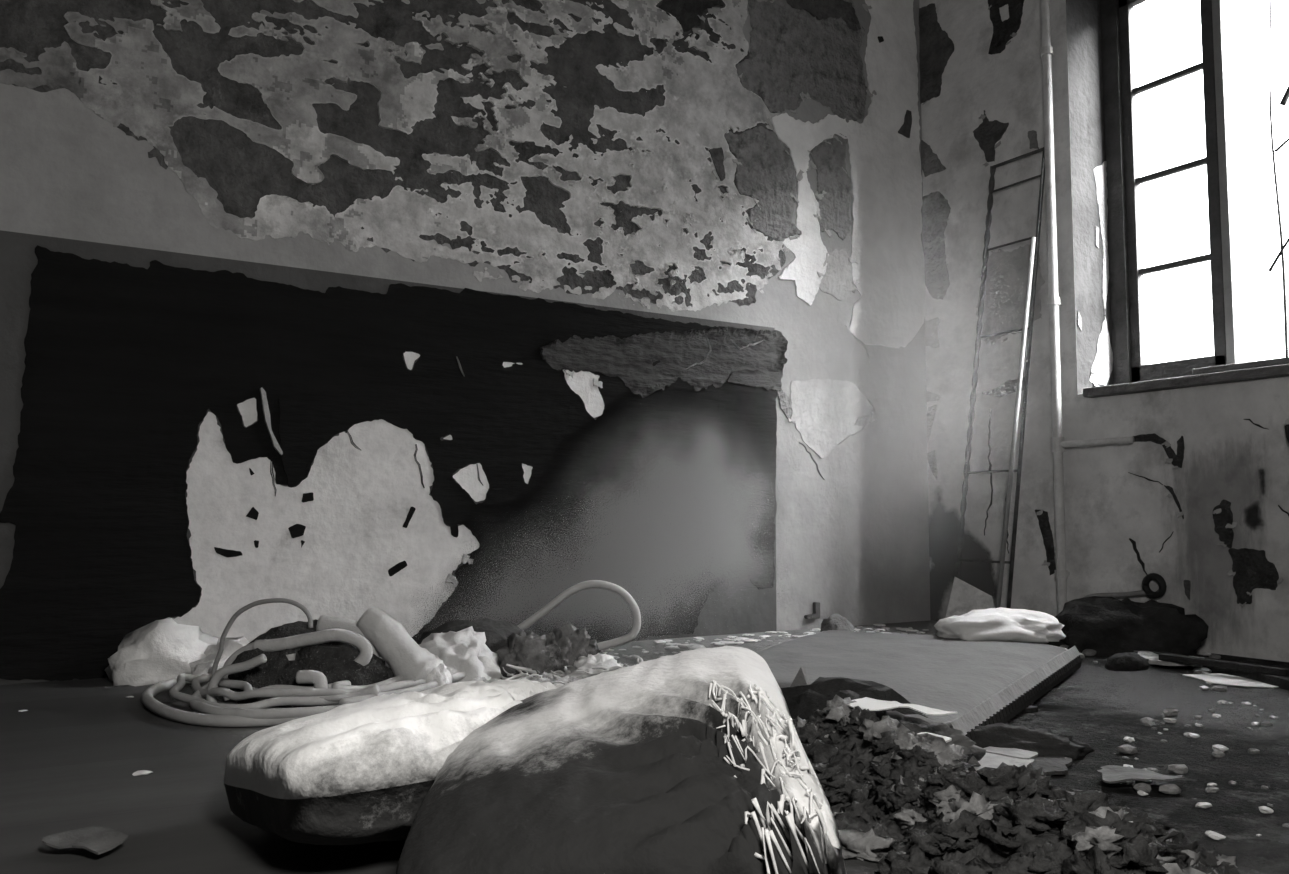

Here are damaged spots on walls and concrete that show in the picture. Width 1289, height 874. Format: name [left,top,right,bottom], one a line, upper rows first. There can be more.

spalling [973,110,1009,167]
peeling [1028,130,1039,149]
peeling [0,0,877,681]
crack [1129,532,1173,575]
spalling [1212,499,1283,608]